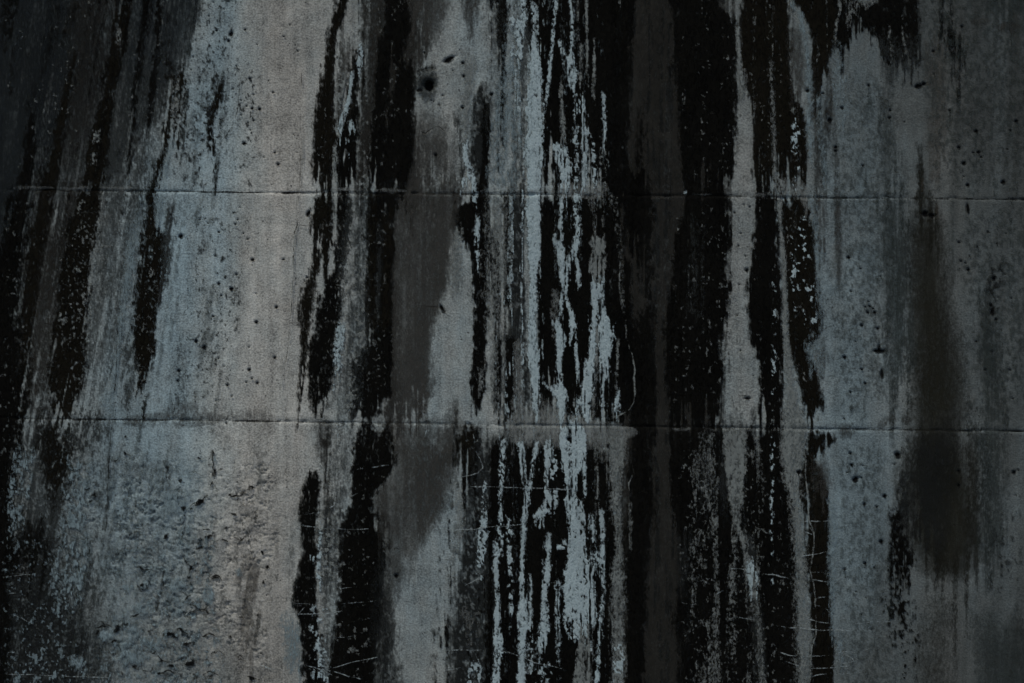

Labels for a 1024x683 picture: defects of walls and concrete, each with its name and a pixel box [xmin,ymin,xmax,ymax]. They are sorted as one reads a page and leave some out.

damp [0,0,260,683]
damp [280,0,921,683]
damp [870,149,1024,683]